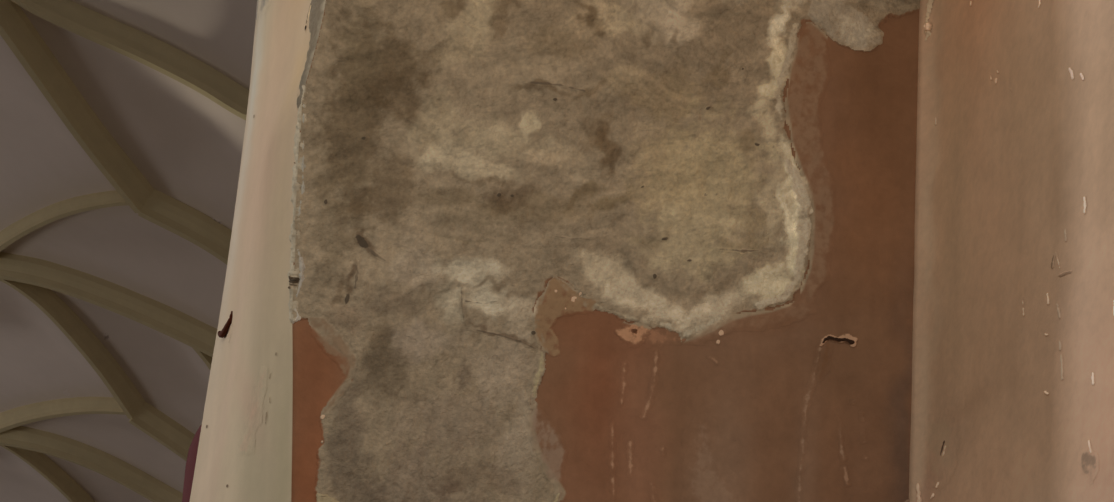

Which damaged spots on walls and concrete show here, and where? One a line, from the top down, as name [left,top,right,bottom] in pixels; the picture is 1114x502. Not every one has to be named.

peeling [256,0,272,22]
flaking render [287,0,934,502]